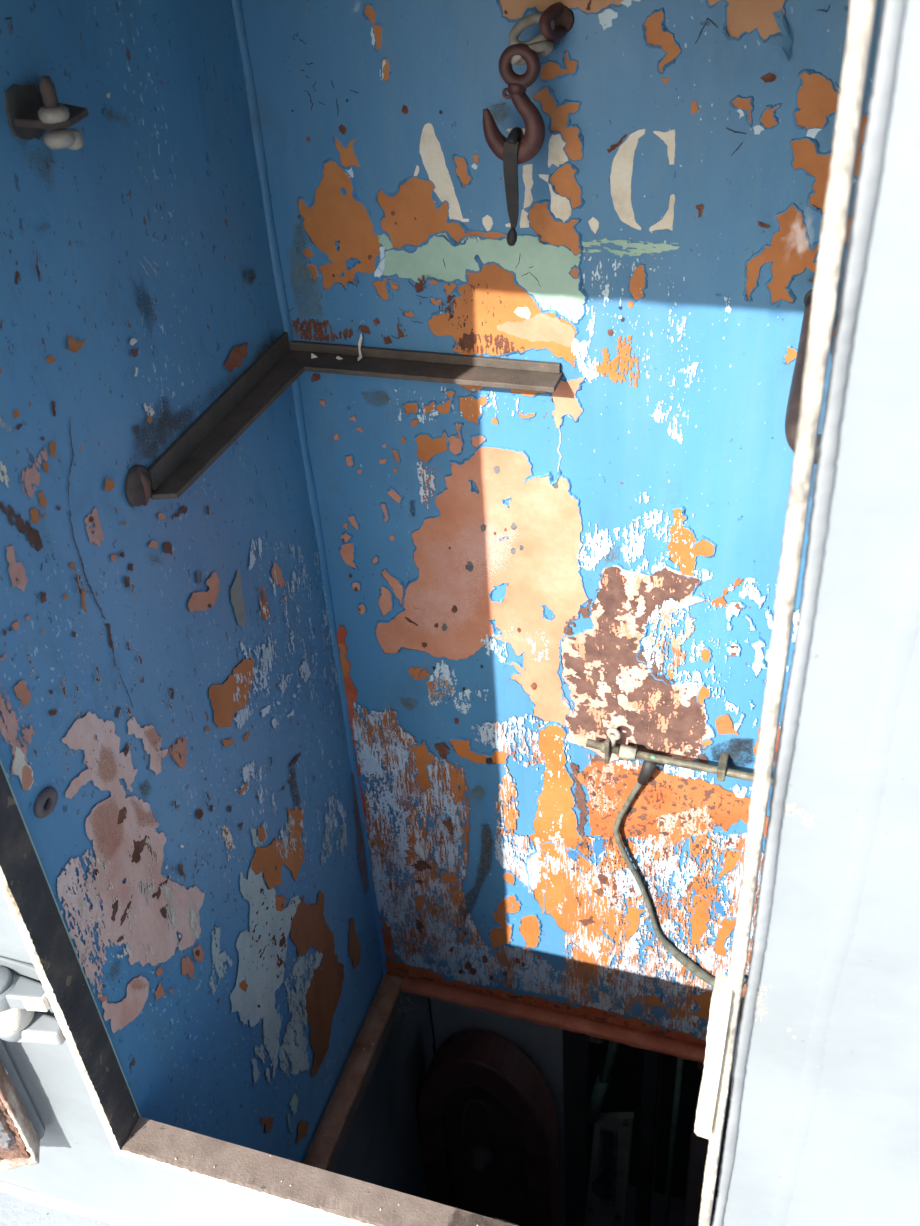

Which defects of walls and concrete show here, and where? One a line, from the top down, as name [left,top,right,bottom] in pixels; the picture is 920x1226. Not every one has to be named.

peeling [496,0,641,30]
peeling [642,7,682,87]
peeling [706,0,793,62]
peeling [853,113,868,183]
peeling [0,50,777,1144]
peeling [791,607,799,643]
rust [562,566,750,926]